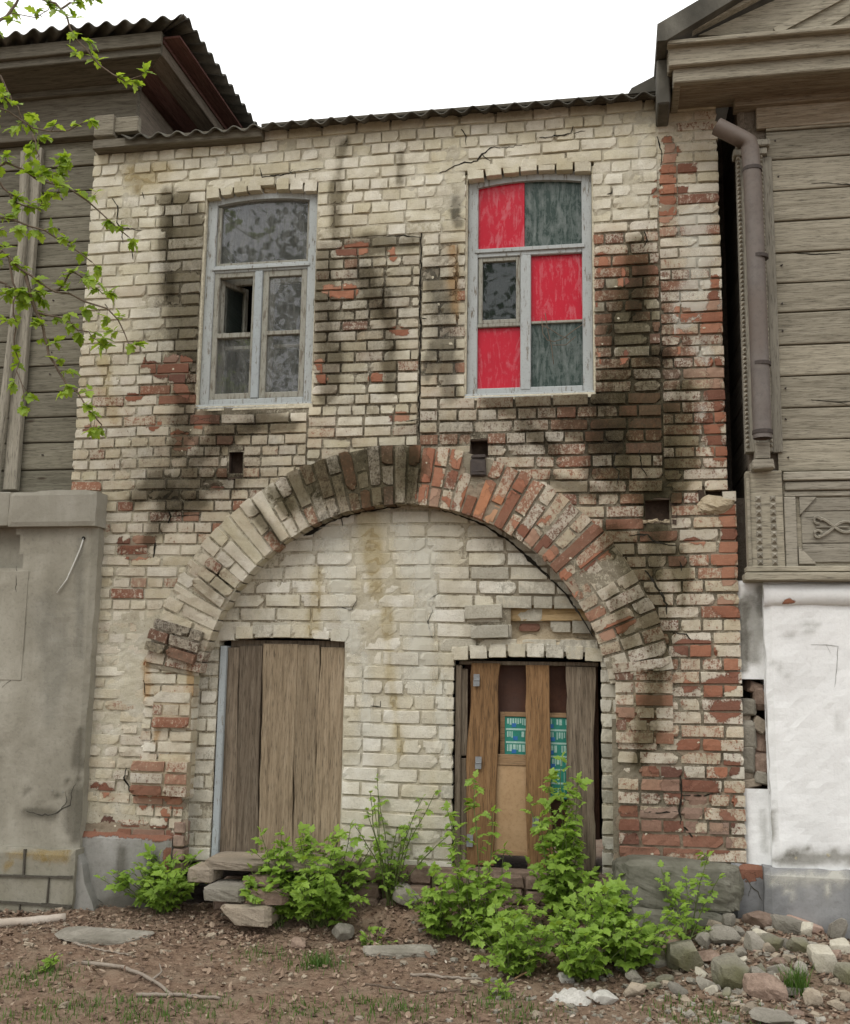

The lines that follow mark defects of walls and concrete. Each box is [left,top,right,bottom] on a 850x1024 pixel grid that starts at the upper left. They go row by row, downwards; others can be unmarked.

crack [440,127,581,173]
peeling [651,136,698,223]
peeling [125,393,145,402]
peeling [140,354,193,399]
peeling [146,409,213,451]
spalling [116,534,157,562]
peeling [673,638,741,724]
crack [27,784,76,816]
spalling [90,780,114,799]
spalling [613,737,741,860]
spalling [82,795,188,870]